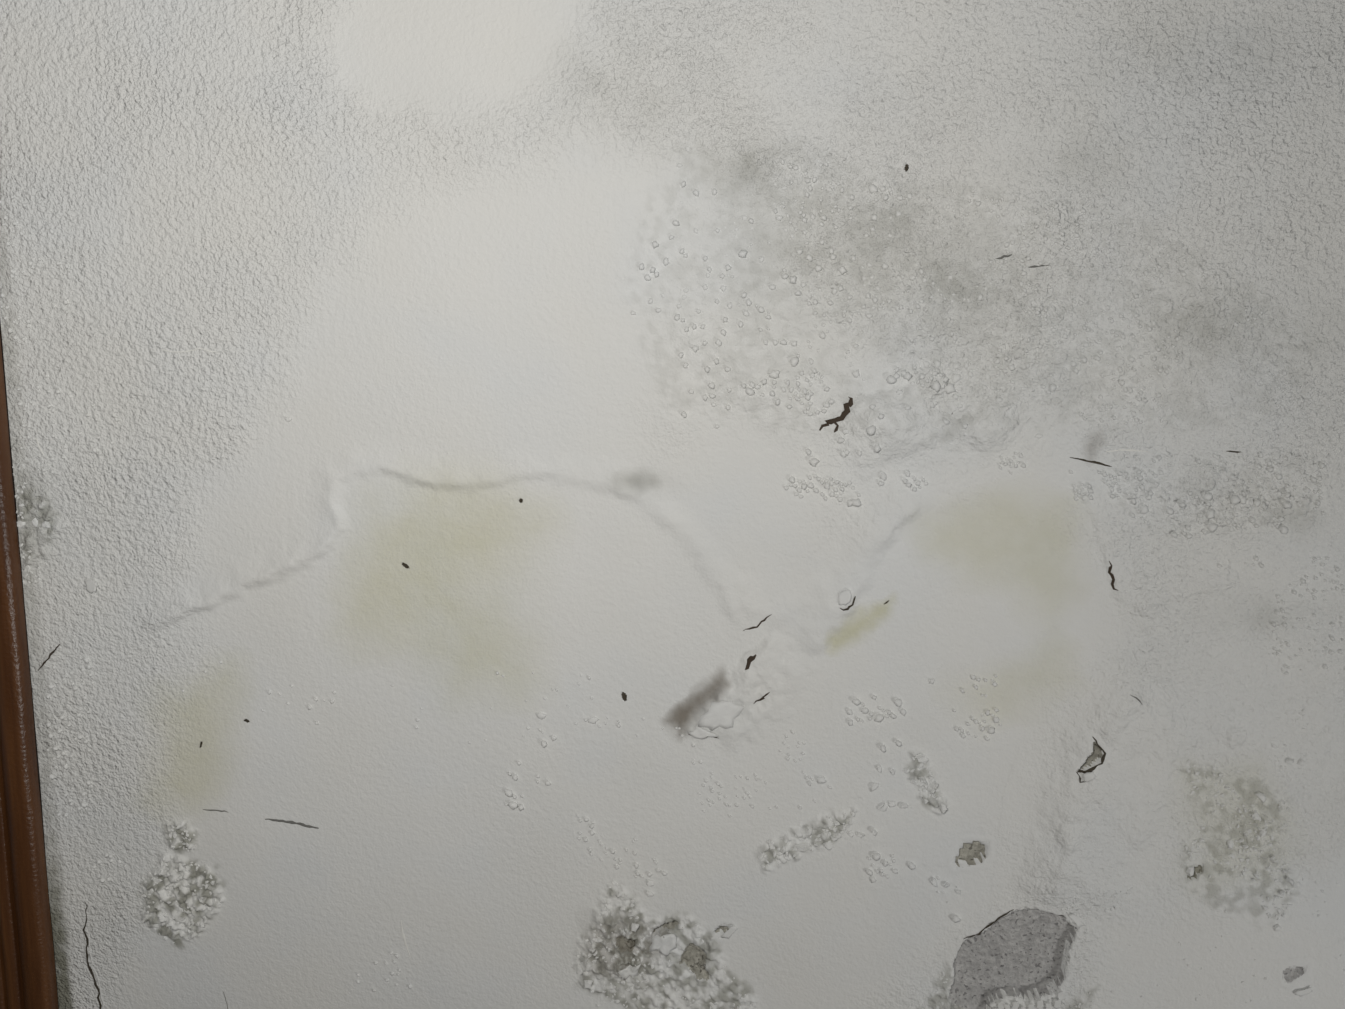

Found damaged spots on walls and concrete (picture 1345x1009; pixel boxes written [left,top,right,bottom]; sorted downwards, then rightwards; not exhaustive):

spalling [130,811,236,957]
spalling [565,873,769,1009]
spalling [743,742,959,882]
spalling [944,833,997,875]
spalling [936,902,1086,1009]
spalling [1179,760,1316,939]
spalling [1275,957,1316,996]